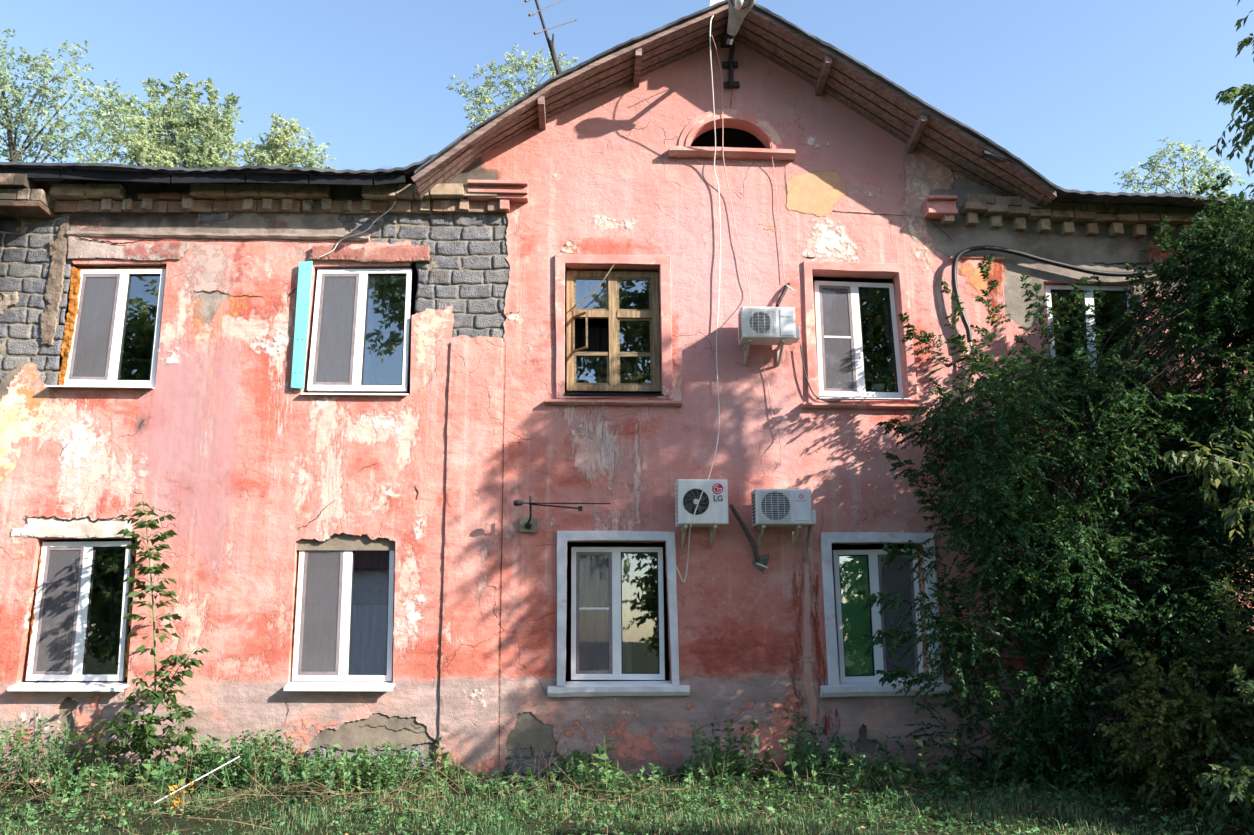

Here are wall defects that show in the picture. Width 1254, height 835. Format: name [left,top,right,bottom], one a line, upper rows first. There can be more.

flaking render [448,157,499,185]
peeling [786,170,880,262]
flaking render [903,161,1202,328]
spalling [0,179,523,515]
peeling [567,406,628,497]
spalling [289,483,400,550]
spalling [284,697,461,778]
spalling [477,697,695,777]
peeling [723,686,804,773]